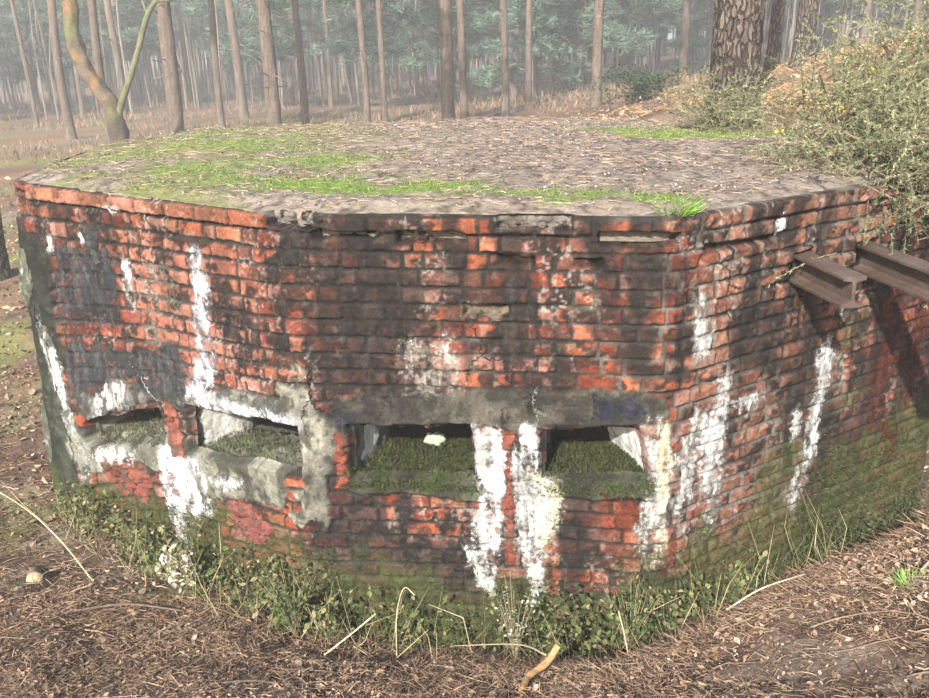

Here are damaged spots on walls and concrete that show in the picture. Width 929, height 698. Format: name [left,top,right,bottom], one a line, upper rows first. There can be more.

water stain [40,324,135,480]
spalling [99,457,152,504]
spalling [162,401,185,459]
water stain [187,244,261,397]
spalling [226,499,275,546]
water stain [464,272,563,603]
water stain [632,371,766,569]
water stain [783,243,835,506]
water stain [840,277,880,399]